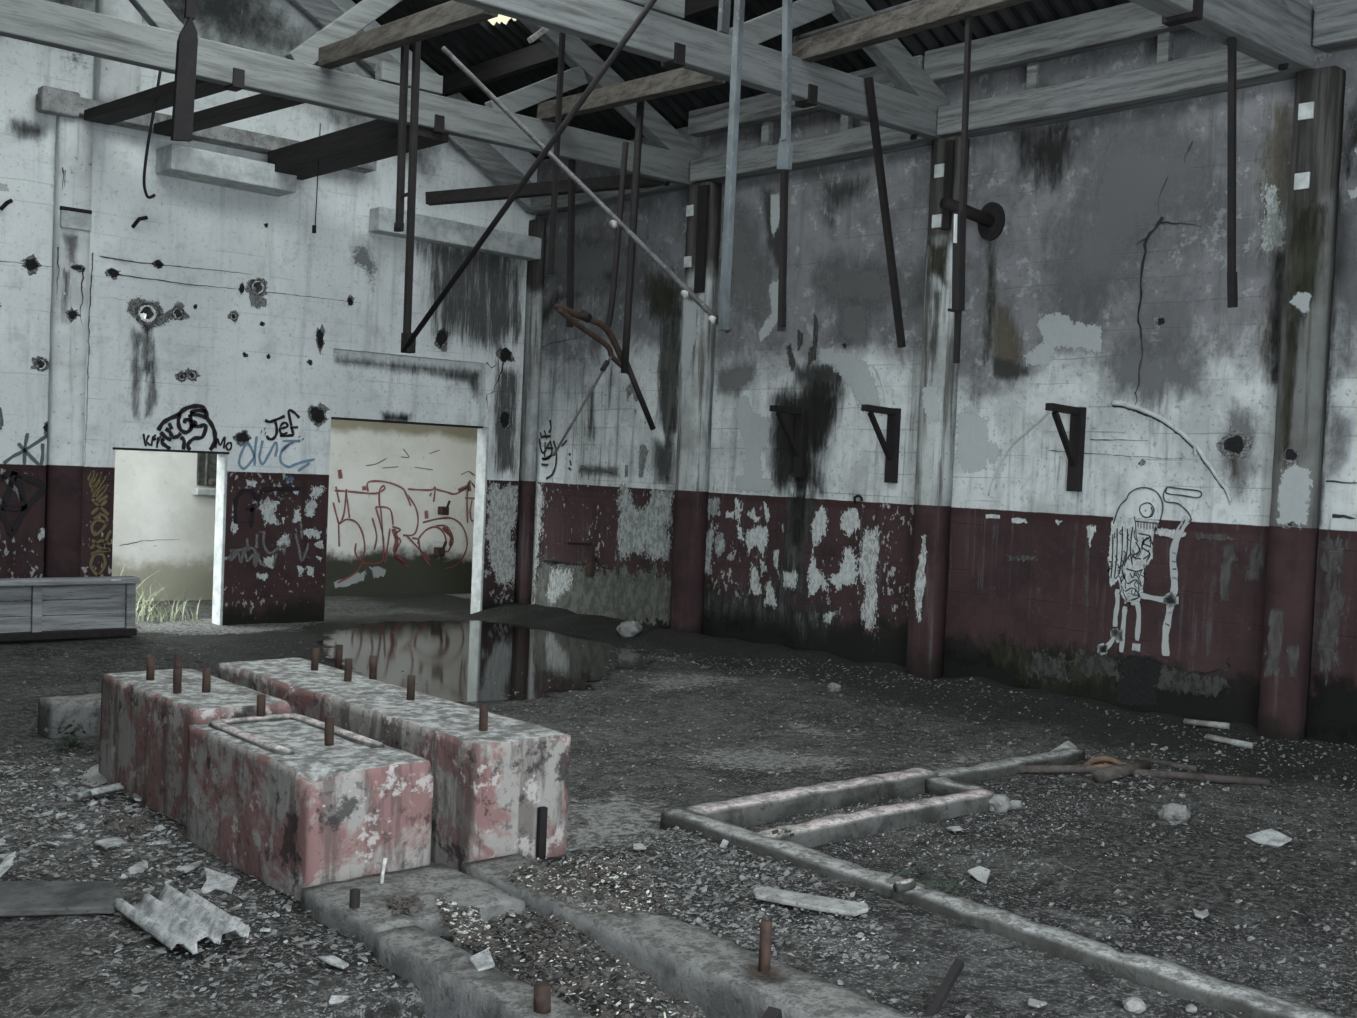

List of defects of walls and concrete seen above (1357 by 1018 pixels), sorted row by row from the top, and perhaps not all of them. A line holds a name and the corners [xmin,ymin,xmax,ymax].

crack [1135,141,1201,405]
peeling [1023,310,1102,367]
crack [1049,439,1196,460]
peeling [256,485,327,581]
peeling [334,566,386,588]
peeling [484,481,519,591]
peeling [531,444,675,626]
water stain [702,363,843,648]
peeling [705,496,880,631]
peeling [914,535,927,623]